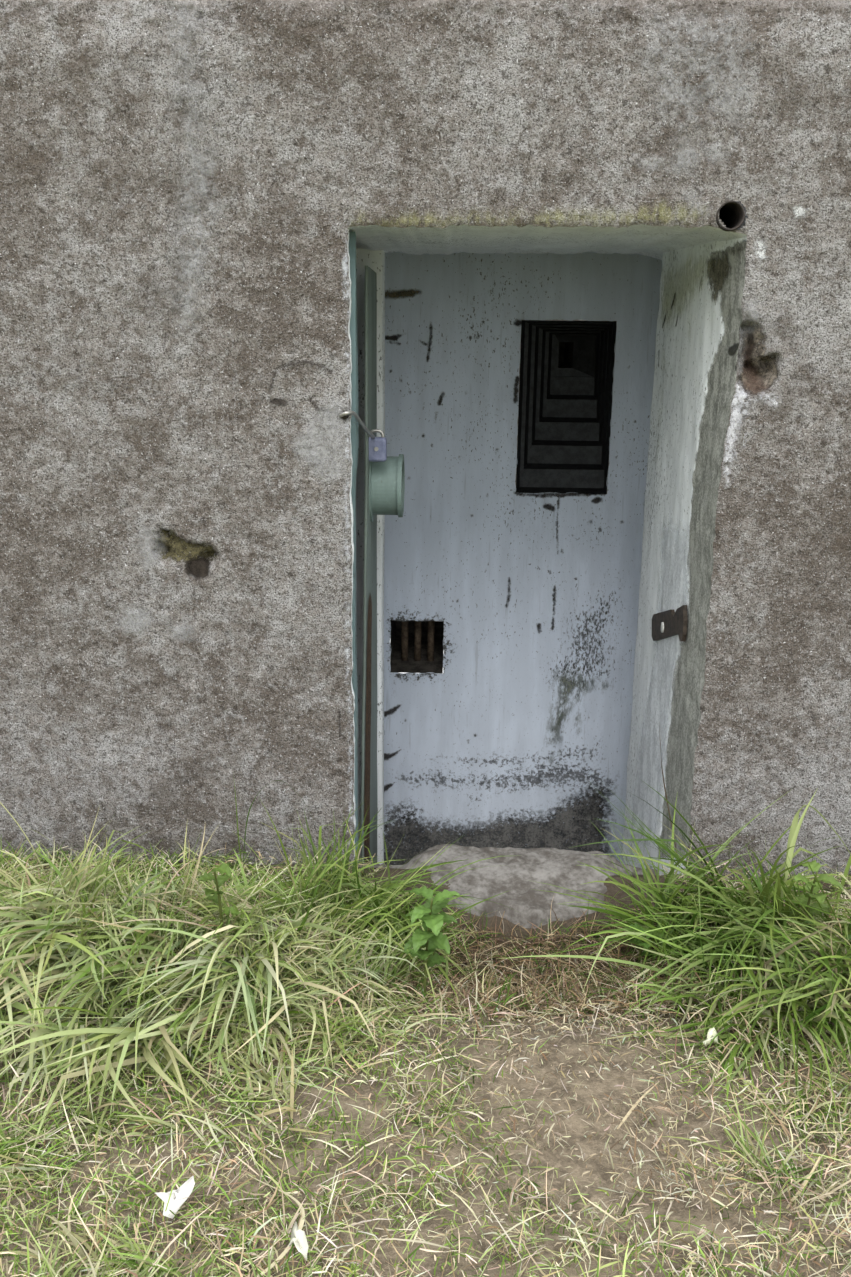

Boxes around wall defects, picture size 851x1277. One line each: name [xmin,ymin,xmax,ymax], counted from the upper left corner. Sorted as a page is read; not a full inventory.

spalling [155,530,217,579]
damp [552,676,594,741]
damp [384,782,612,865]